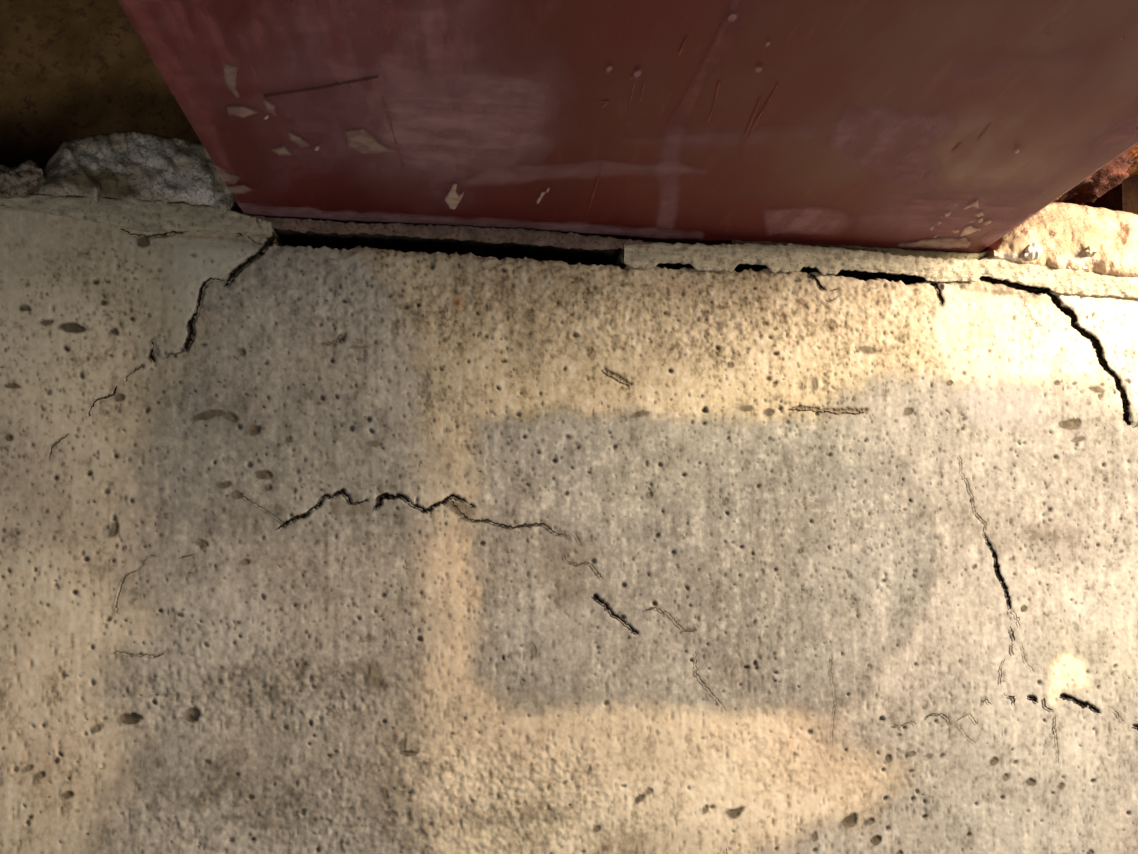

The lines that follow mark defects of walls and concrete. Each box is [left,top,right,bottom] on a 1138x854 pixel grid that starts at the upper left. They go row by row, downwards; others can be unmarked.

crack [121,229,182,238]
crack [88,233,276,416]
crack [810,273,838,301]
crack [931,282,944,306]
crack [981,277,1138,427]
crack [240,489,727,712]
crack [894,457,1138,761]